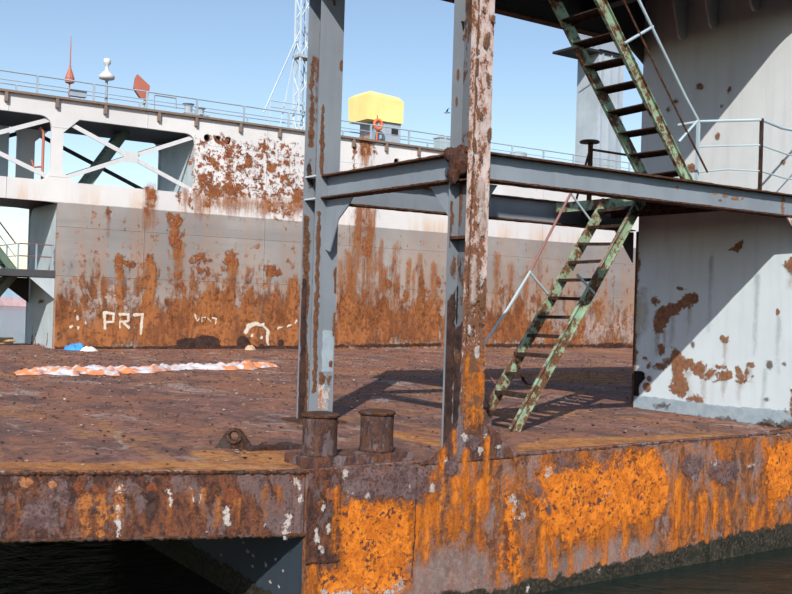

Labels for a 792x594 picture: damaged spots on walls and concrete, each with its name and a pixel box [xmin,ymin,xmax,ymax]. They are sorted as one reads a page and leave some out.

corrosion [31,56,325,418]
corrosion [332,0,543,446]
corrosion [533,320,565,348]
corrosion [569,253,755,403]
corrosion [0,450,299,538]
corrosion [309,456,491,594]
corrosion [496,428,792,584]